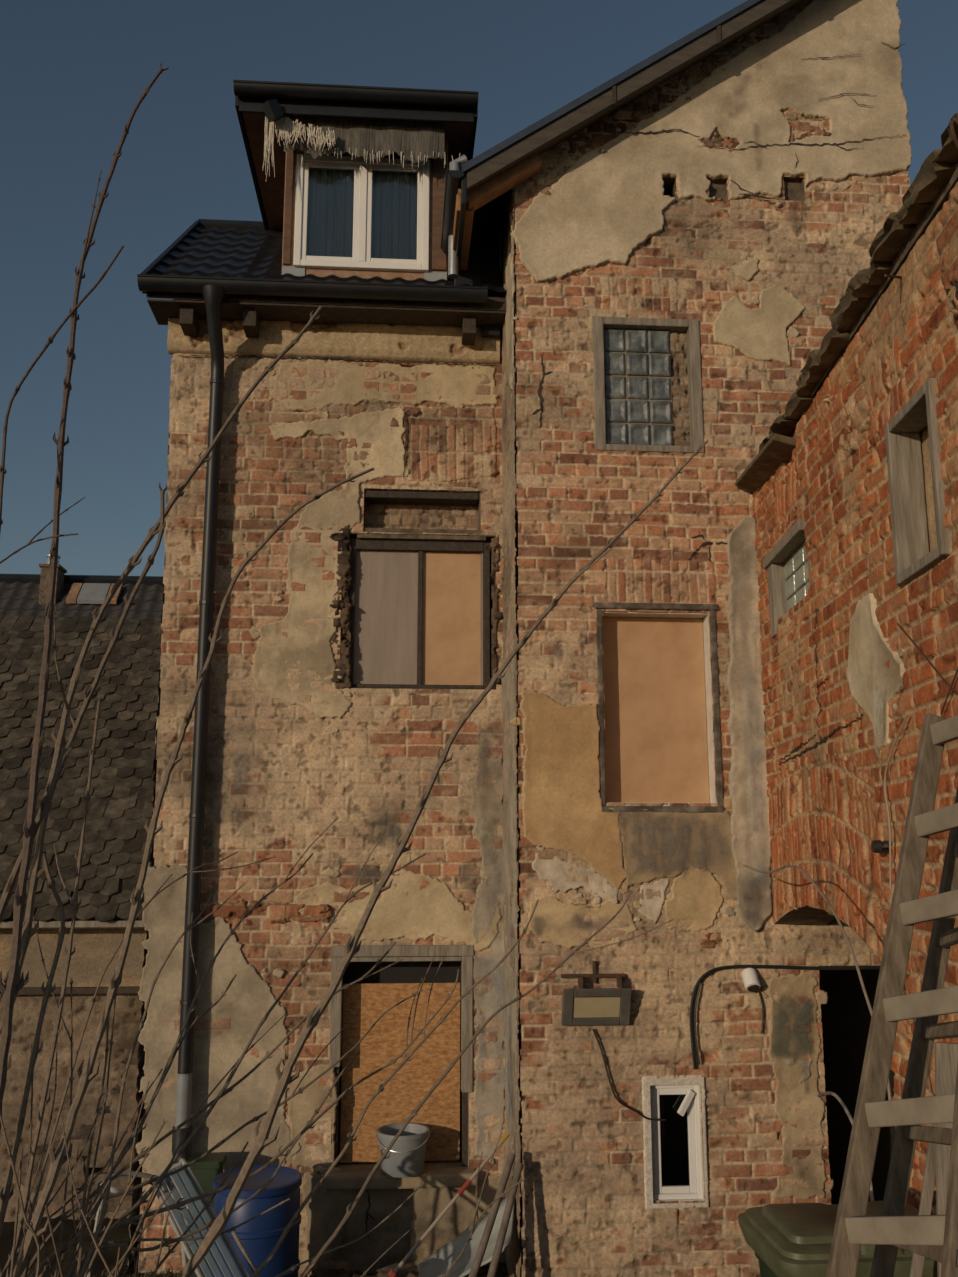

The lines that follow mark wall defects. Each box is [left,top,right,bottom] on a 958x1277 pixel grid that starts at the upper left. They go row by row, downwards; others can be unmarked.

crack [808,42,905,59]
crack [818,93,877,107]
crack [627,129,904,168]
crack [731,180,785,200]
crack [532,356,552,427]
peeling [249,0,912,759]
peeling [130,535,738,1277]